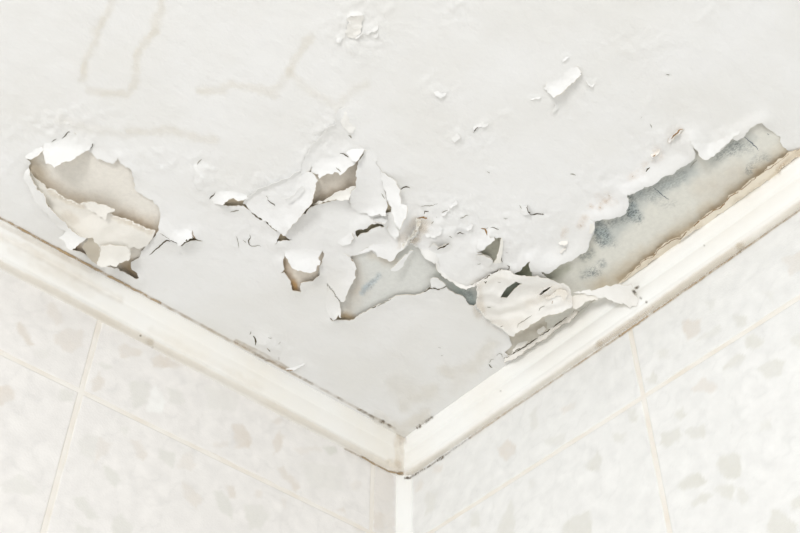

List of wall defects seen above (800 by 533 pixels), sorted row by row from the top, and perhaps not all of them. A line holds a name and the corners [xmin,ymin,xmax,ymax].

peeling [530,56,598,113]
peeling [23,133,201,279]
peeling [212,107,800,363]
damp [619,244,751,337]